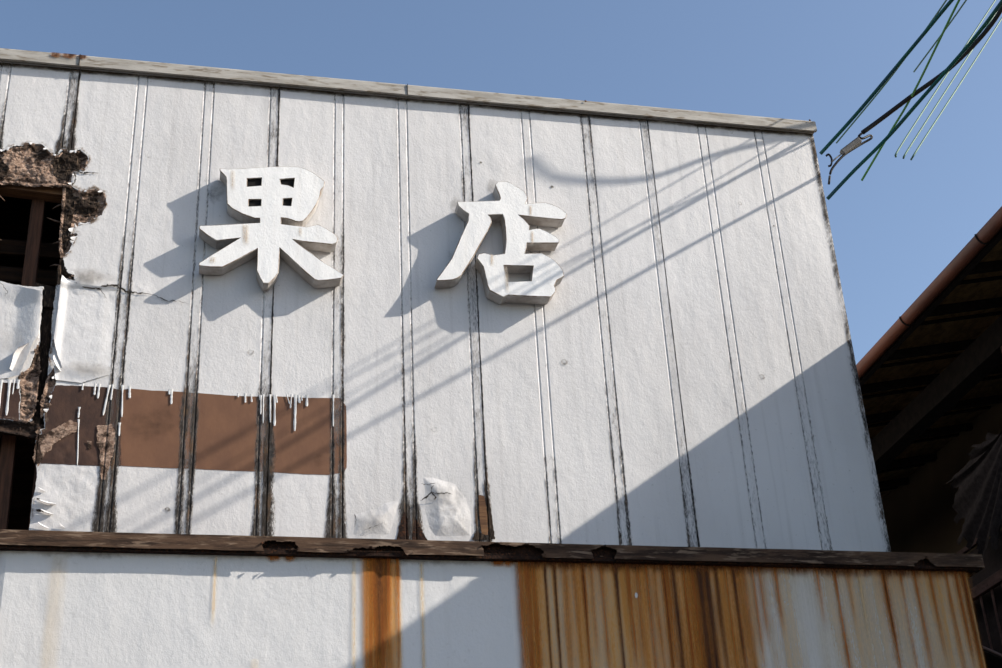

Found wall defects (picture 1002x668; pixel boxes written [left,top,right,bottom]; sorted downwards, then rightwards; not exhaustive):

peeling [0,142,119,466]
crack [74,282,186,303]
damp [0,62,891,552]
peeling [87,424,115,480]
crack [420,483,450,501]
corrosion [364,547,401,668]
corrosion [484,545,986,668]